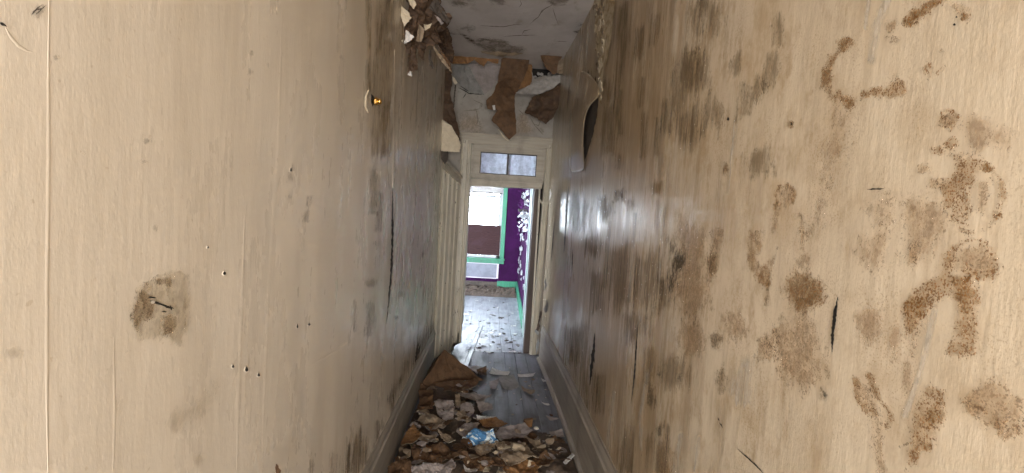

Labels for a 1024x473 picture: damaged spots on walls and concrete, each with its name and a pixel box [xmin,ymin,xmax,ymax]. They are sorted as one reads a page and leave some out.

peeling [401,0,431,44]
spalling [532,68,552,80]
water stain [130,277,176,337]
crack [830,297,838,351]